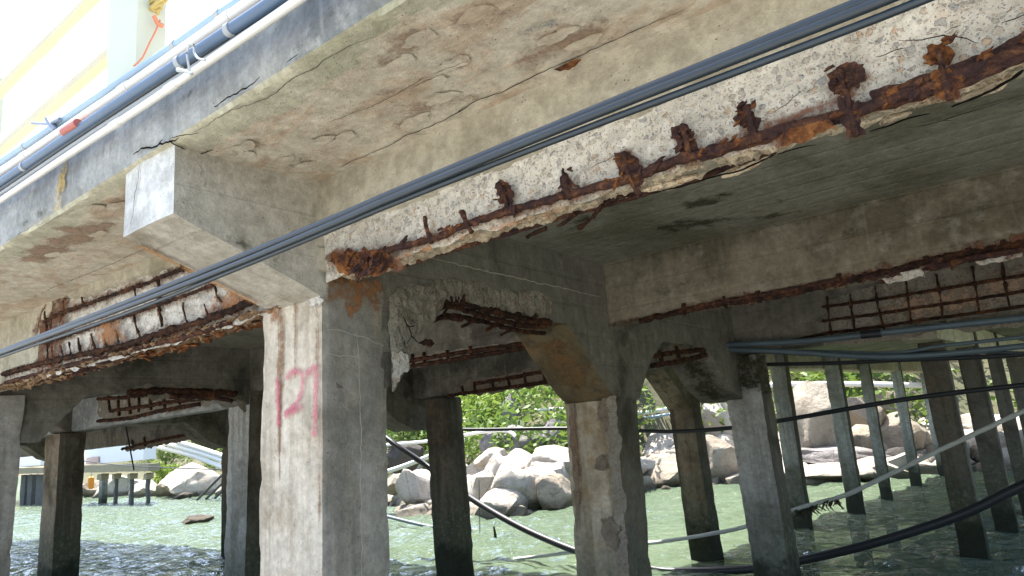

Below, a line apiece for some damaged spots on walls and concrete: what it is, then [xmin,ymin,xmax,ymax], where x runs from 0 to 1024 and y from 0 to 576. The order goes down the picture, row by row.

crack [130,37,371,224]
corrosion [493,179,515,205]
crack [341,10,683,167]
corrosion [613,149,645,190]
spalling [323,0,1024,283]
corrosion [671,123,702,163]
corrosion [715,32,1024,149]
spalling [0,264,281,391]
spalling [388,278,553,392]
spalling [447,367,549,397]
spalling [639,234,1024,345]
corrosion [882,267,1024,323]